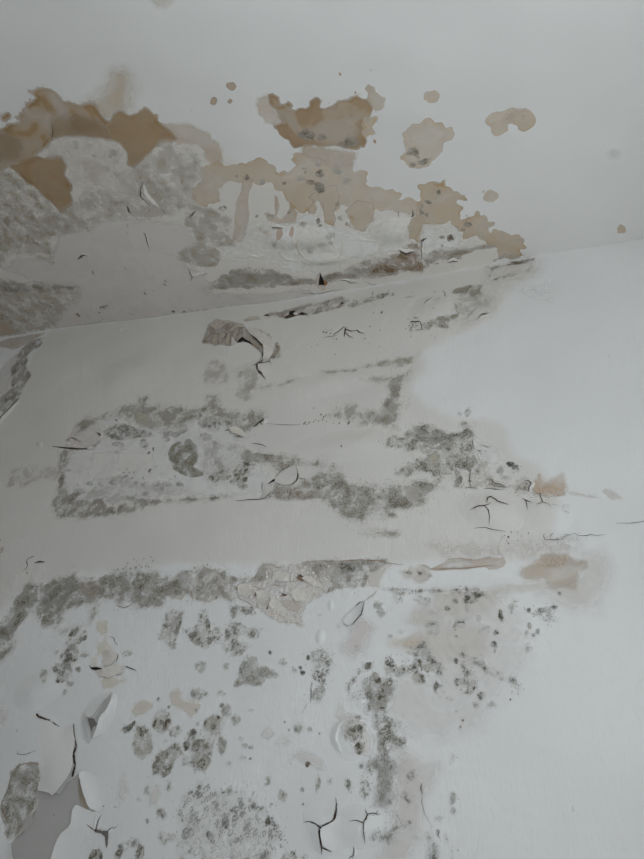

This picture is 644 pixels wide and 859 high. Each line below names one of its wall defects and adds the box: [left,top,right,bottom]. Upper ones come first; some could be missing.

water stain [0,74,536,290]
peeling [4,221,328,380]
crack [311,327,365,355]
water stain [6,352,530,538]
crack [467,469,643,545]
water stain [0,761,40,838]
peeling [0,692,117,859]
water stain [0,557,335,704]
water stain [123,690,304,859]
spalling [236,561,339,627]
crack [302,797,381,857]
water stain [284,535,602,859]